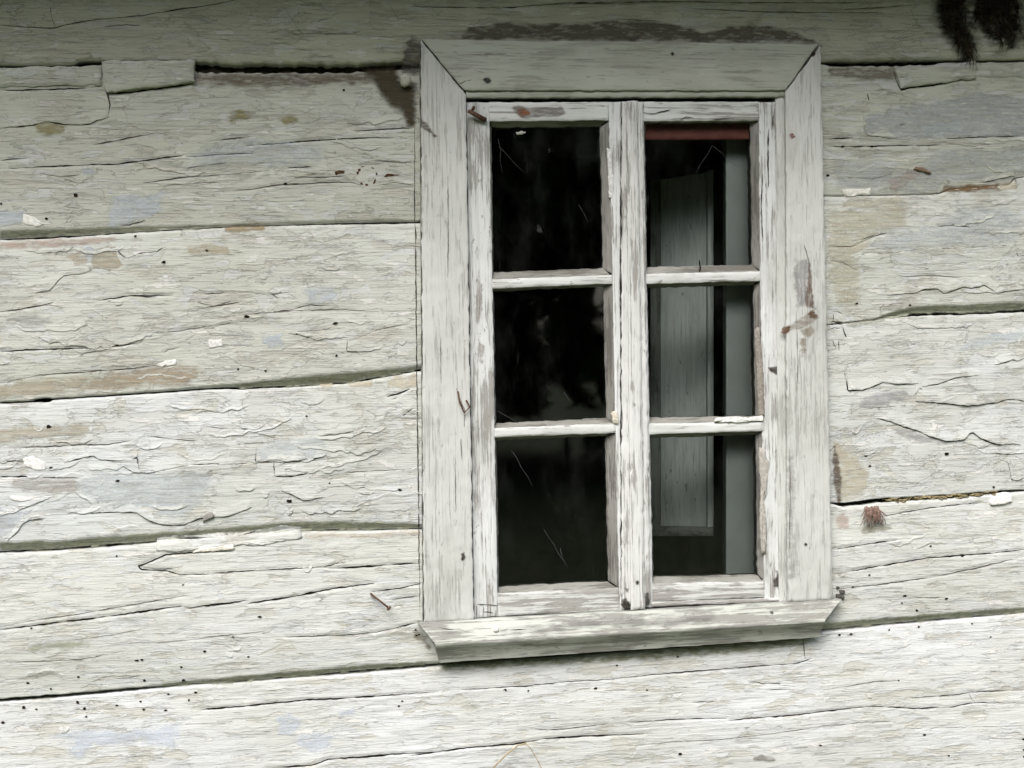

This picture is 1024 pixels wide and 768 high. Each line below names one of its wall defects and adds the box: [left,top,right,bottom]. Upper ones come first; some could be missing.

leakage [934,0,1024,69]
leakage [365,68,415,126]
peeling [826,188,871,216]
peeling [943,170,1024,248]
peeling [0,321,155,354]
peeling [25,244,165,293]
peeling [178,306,283,348]
rust [789,264,818,345]
peeling [880,275,1024,315]
peeling [137,359,192,383]
crack [0,125,441,662]
peeling [0,403,422,555]